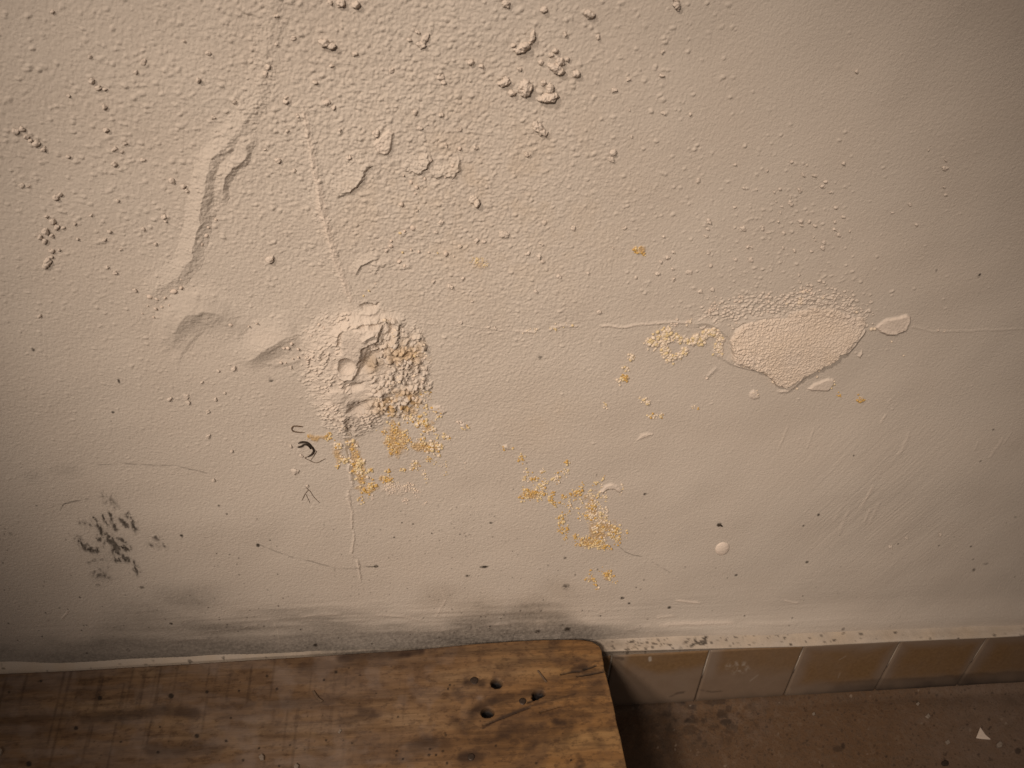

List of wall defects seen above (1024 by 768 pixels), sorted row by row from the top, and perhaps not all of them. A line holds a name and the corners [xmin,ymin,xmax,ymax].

flaking render [298,226,470,440]
leakage [643,326,726,365]
leakage [307,389,451,506]
leakage [515,453,628,551]
leakage [0,490,722,663]